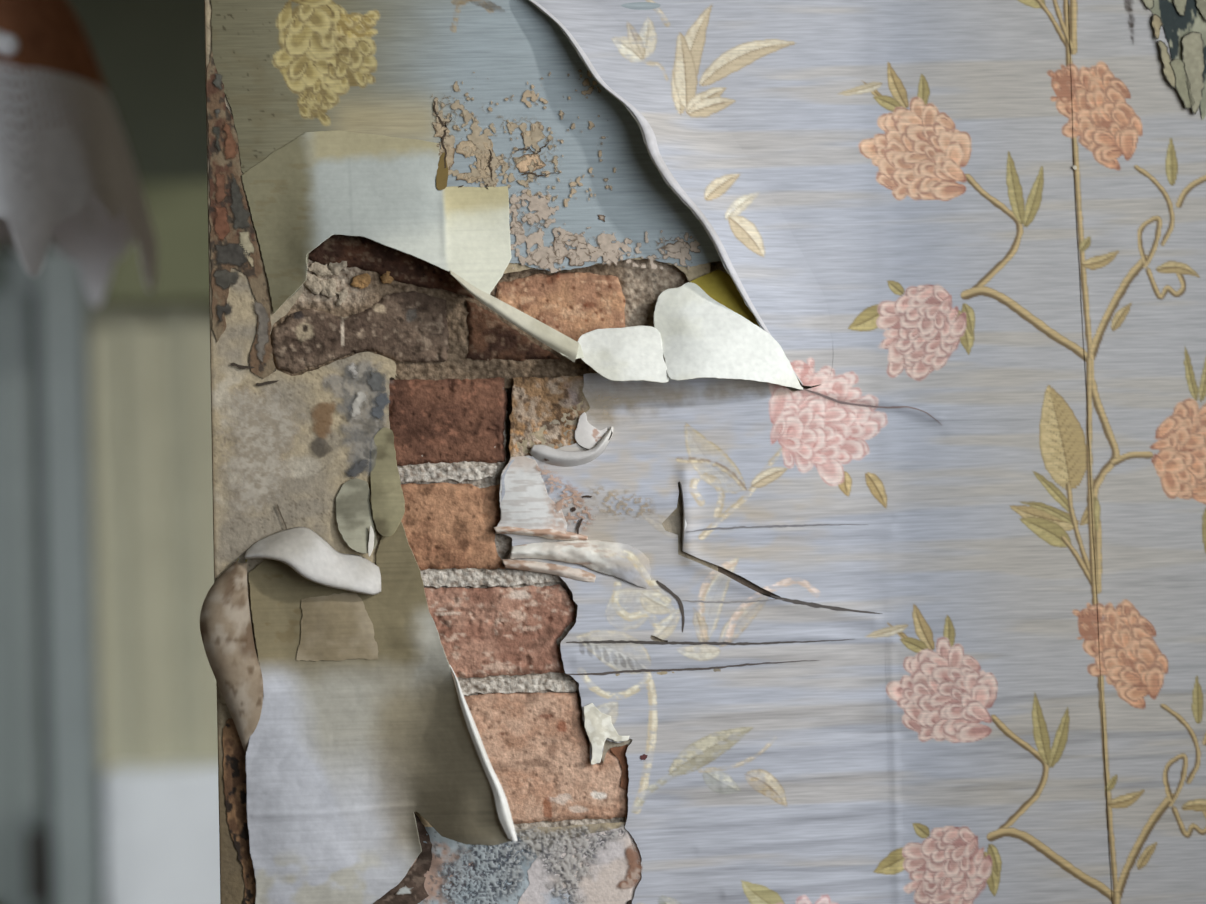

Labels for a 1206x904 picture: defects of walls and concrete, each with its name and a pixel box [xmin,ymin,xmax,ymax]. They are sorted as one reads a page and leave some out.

flaking render [710,261,728,274]
peeling [200,52,701,904]
crack [679,482,867,543]
crack [656,566,882,632]